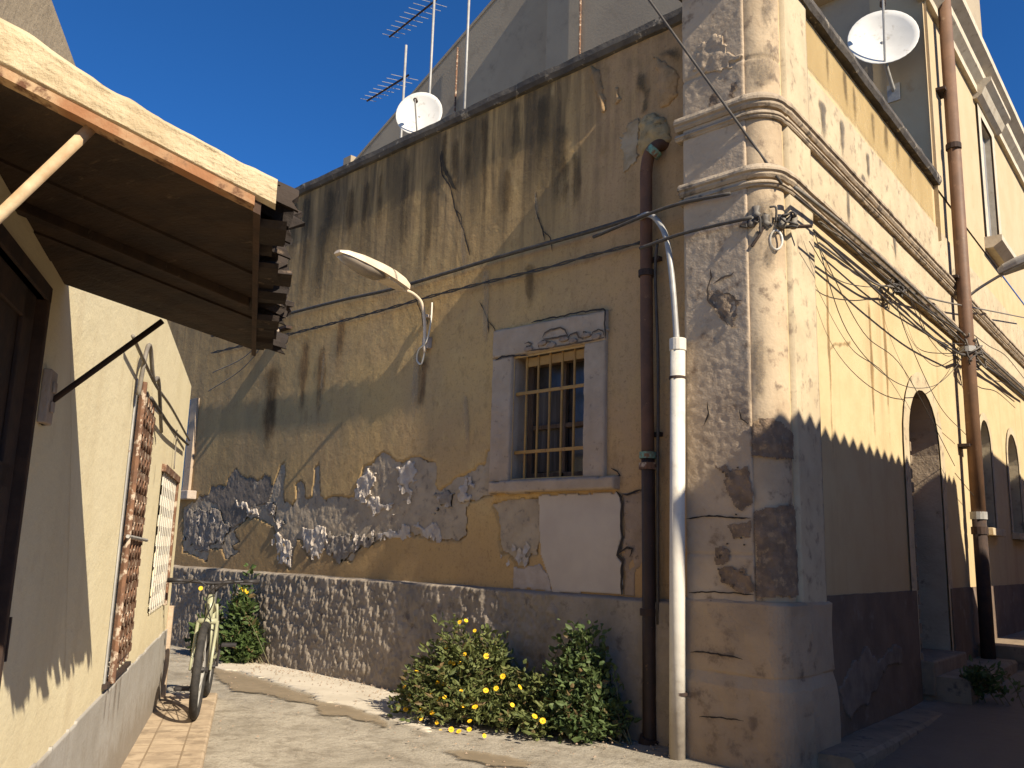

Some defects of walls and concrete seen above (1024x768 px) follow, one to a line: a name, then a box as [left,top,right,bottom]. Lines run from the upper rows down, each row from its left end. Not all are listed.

crack [440,151,470,255]
crack [535,196,552,248]
flaking render [706,270,742,328]
peeling [182,451,540,570]
flaking render [621,491,642,596]
crack [687,513,749,521]
crack [689,589,753,597]
spalling [714,418,799,599]